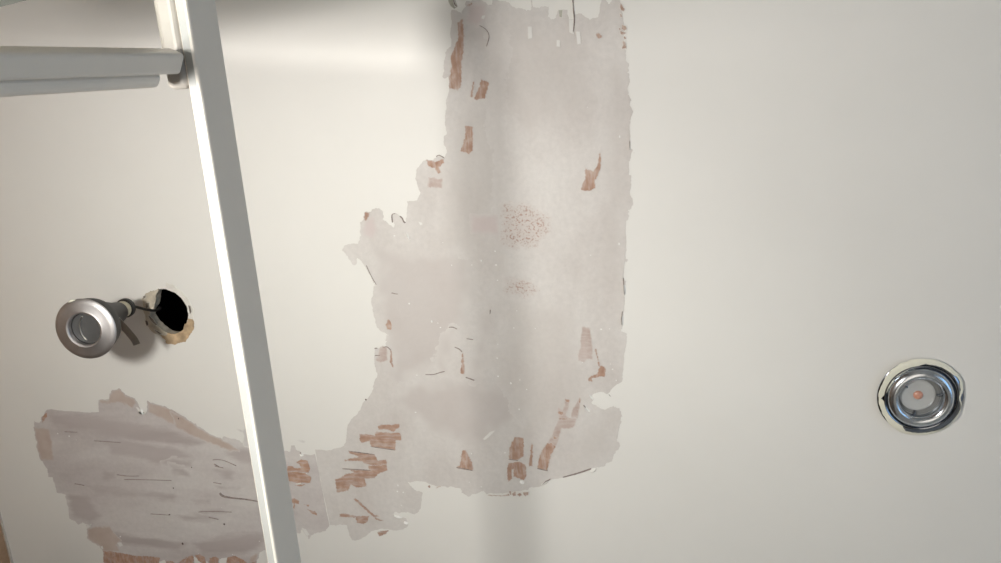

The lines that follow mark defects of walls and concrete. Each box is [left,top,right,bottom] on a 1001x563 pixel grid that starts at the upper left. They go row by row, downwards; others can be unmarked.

peeling [33,388,266,563]
peeling [284,0,633,541]